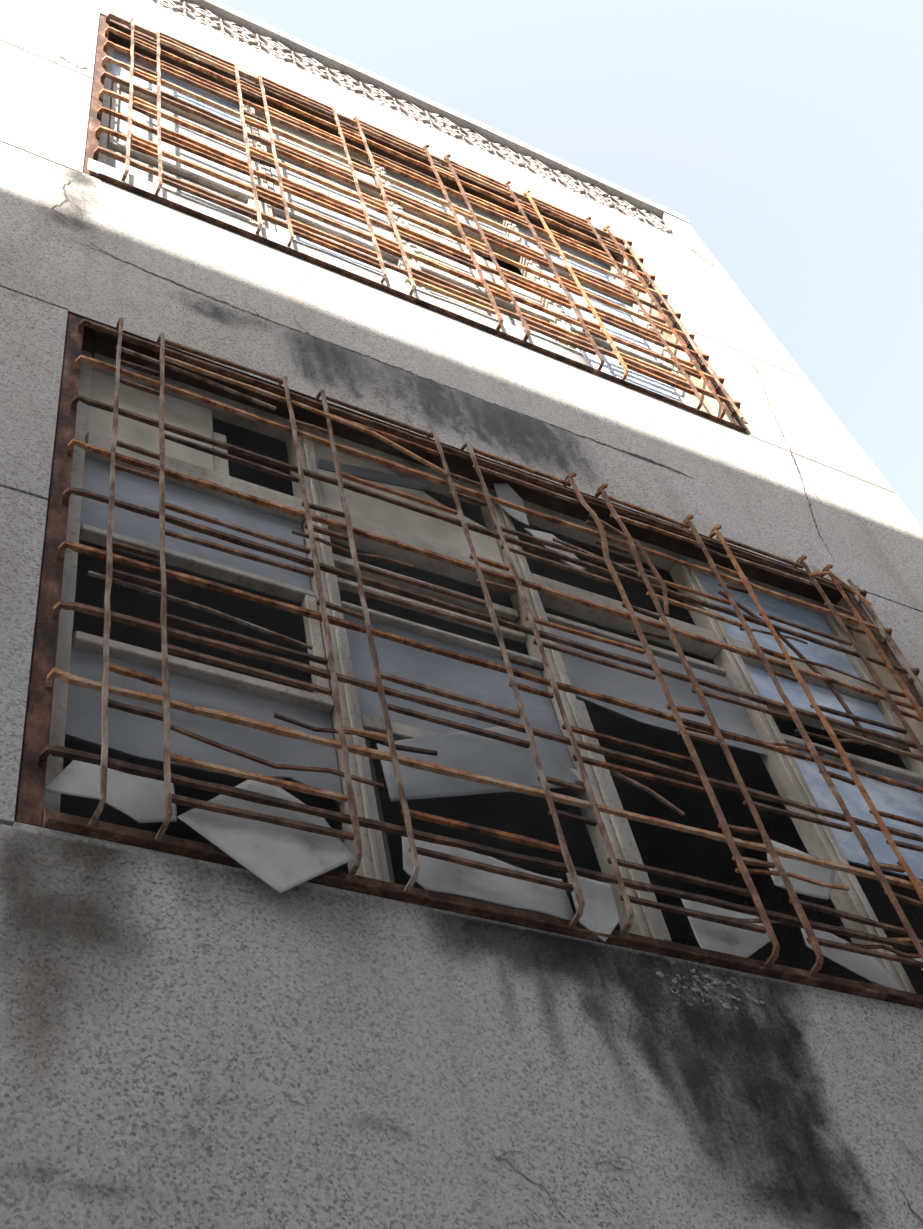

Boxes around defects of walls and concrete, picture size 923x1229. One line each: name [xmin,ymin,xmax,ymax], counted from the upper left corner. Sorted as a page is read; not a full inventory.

damp [196,305,227,321]
damp [293,335,373,396]
crack [42,180,694,479]
damp [394,368,589,471]
crack [752,360,834,560]
damp [0,835,120,944]
damp [432,913,870,1229]
crack [489,1150,567,1219]